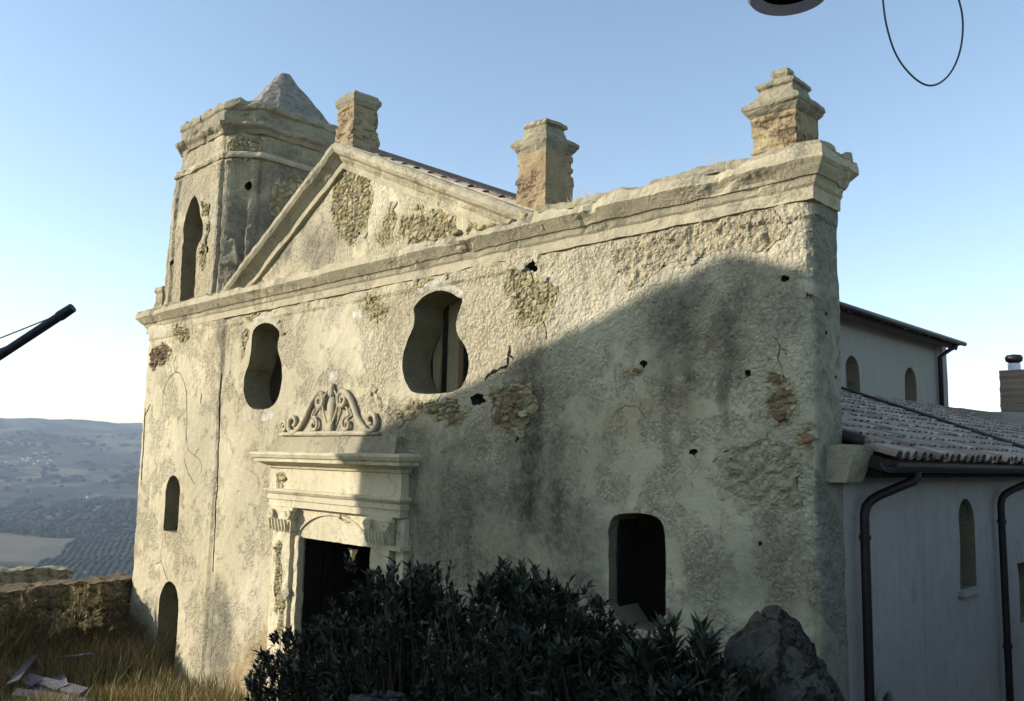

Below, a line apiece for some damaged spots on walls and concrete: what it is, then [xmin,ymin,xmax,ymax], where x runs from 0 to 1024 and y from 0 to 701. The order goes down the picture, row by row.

flaking render [225,133,266,163]
flaking render [269,175,303,217]
flaking render [327,169,479,248]
flaking render [360,291,389,324]
flaking render [505,259,558,328]
flaking render [149,321,190,371]
crack [485,345,513,381]
flaking render [372,378,539,438]
flaking render [717,365,818,510]
crack [141,357,222,669]